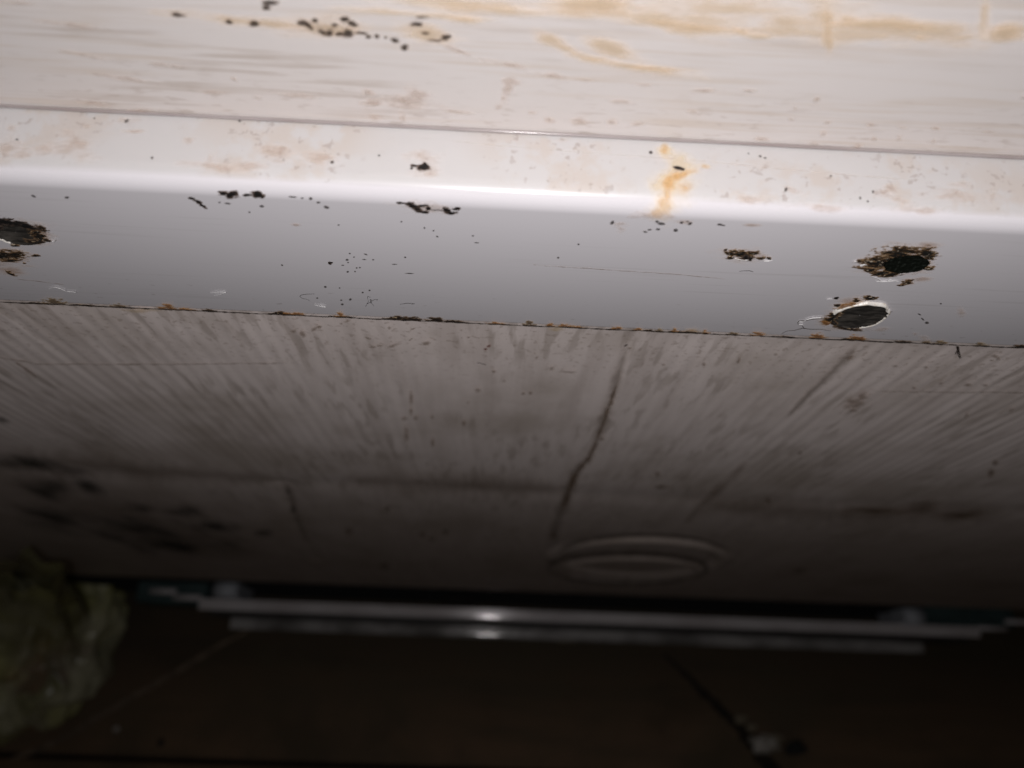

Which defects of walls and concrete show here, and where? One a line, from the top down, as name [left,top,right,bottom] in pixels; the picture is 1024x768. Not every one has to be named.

water stain [297,17,408,50]
water stain [411,16,452,42]